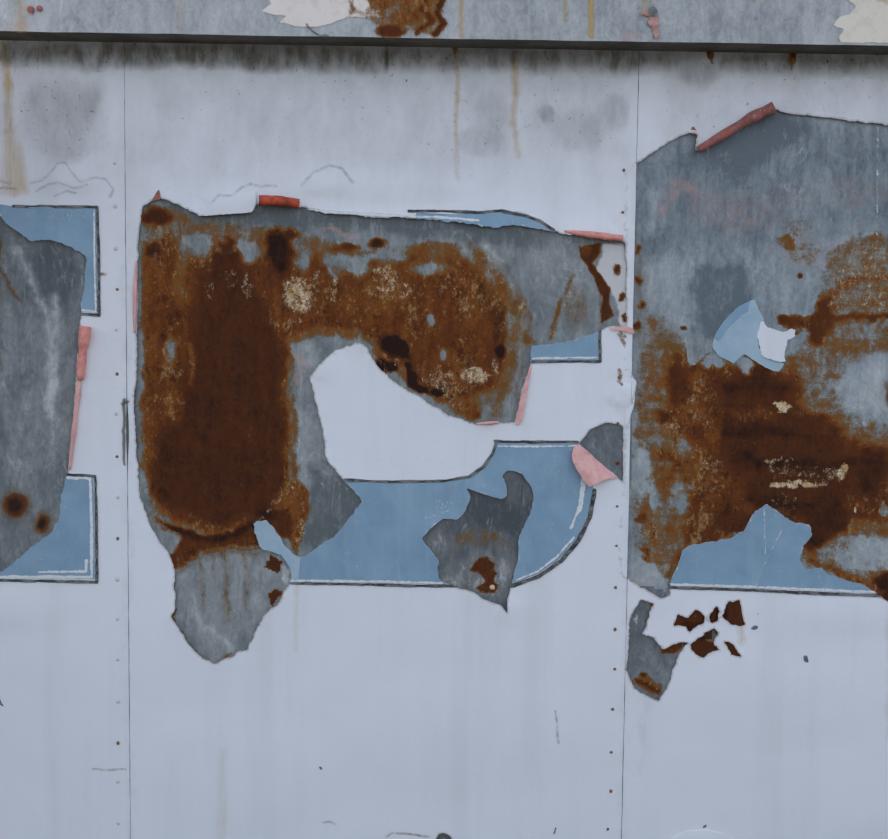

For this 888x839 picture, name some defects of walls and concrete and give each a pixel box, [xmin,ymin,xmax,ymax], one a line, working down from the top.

peeling [261,0,448,38]
peeling [833,0,888,43]
peeling [0,216,91,572]
rust [137,204,535,569]
peeling [126,102,888,701]
rust [579,220,888,601]
rust [3,492,28,518]
rust [264,554,283,573]
rust [470,556,498,593]
rust [268,589,282,607]
rust [659,642,682,654]
rust [632,672,662,695]